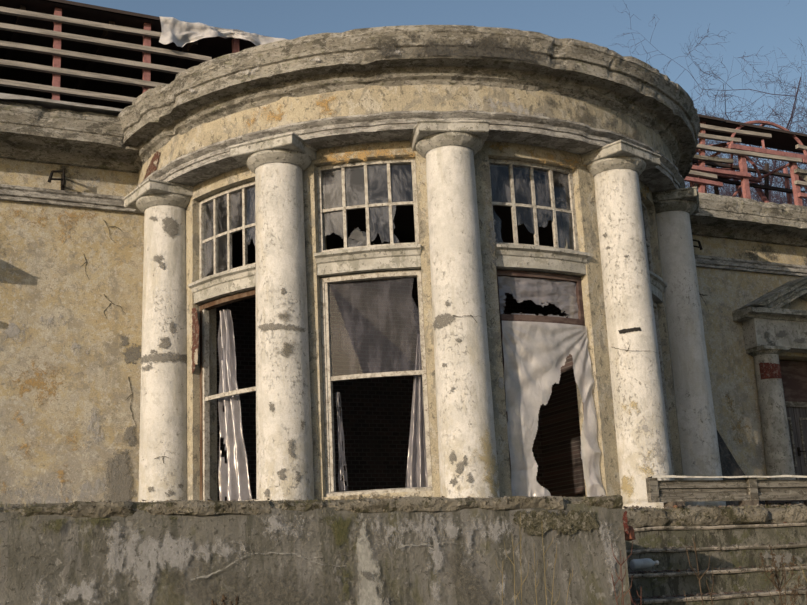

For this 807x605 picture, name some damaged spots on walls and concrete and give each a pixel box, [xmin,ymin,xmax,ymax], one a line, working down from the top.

flaking render [143,152,161,180]
spalling [119,322,175,372]
flaking render [759,362,782,380]
crack [191,541,345,581]
water stain [342,513,511,605]